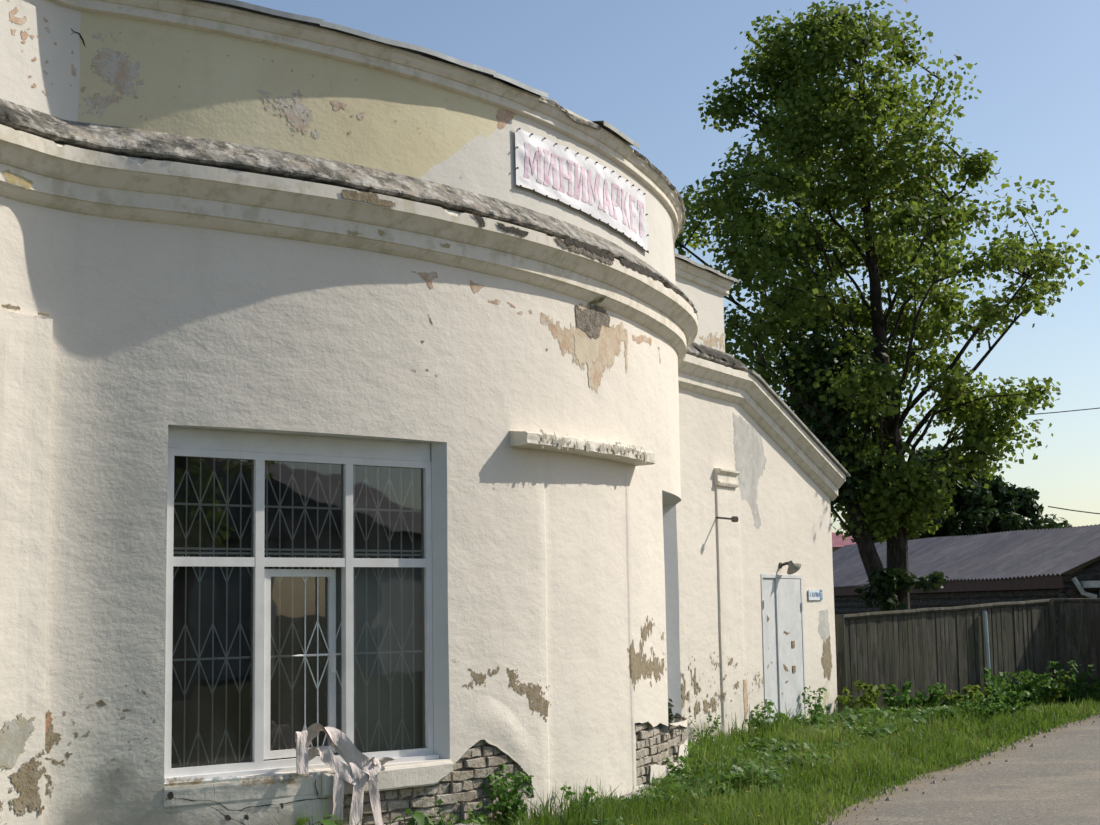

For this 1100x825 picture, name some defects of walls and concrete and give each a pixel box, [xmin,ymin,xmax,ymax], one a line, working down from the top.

peeling [8,0,57,96]
leakage [0,103,30,123]
peeling [412,271,438,289]
flaking render [470,280,652,393]
peeling [627,615,664,691]
spalling [818,609,832,680]
spalling [81,685,148,720]
peeling [454,661,550,723]
spalling [635,651,790,786]
flaking render [0,711,99,824]
crack [164,774,330,825]
spalling [334,739,534,825]